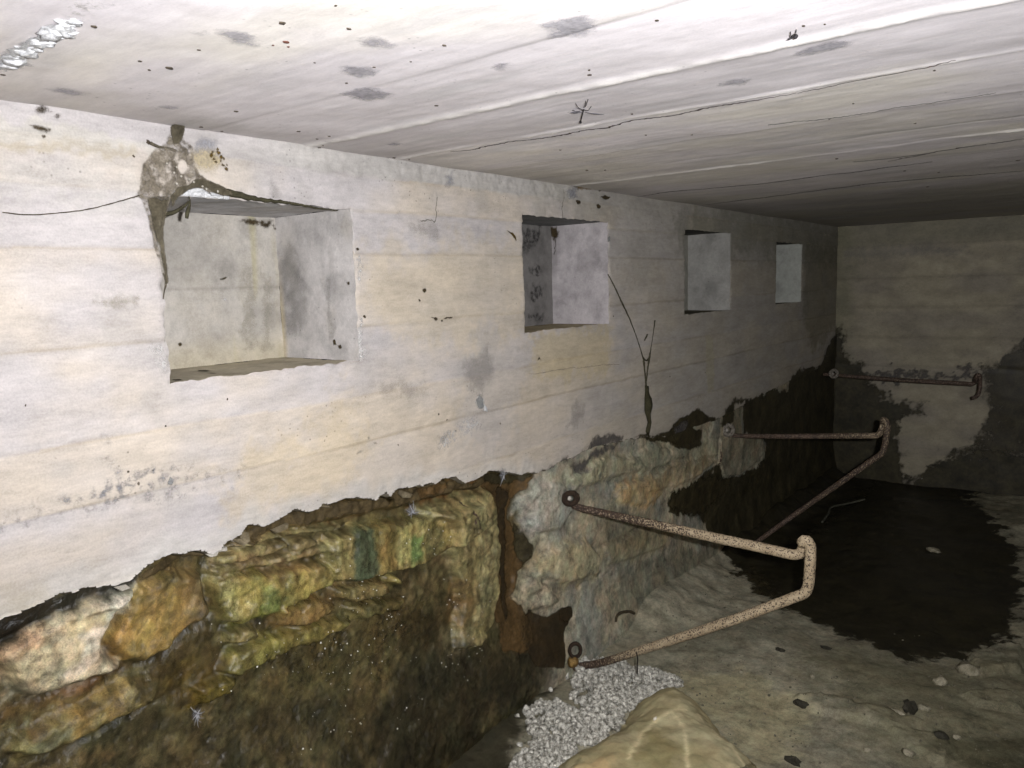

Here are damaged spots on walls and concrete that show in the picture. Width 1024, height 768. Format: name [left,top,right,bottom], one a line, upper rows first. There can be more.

crack [451,60,955,152]
crack [774,93,994,125]
spalling [174,188,230,200]
spalling [140,476,484,580]
leakage [542,327,1024,664]